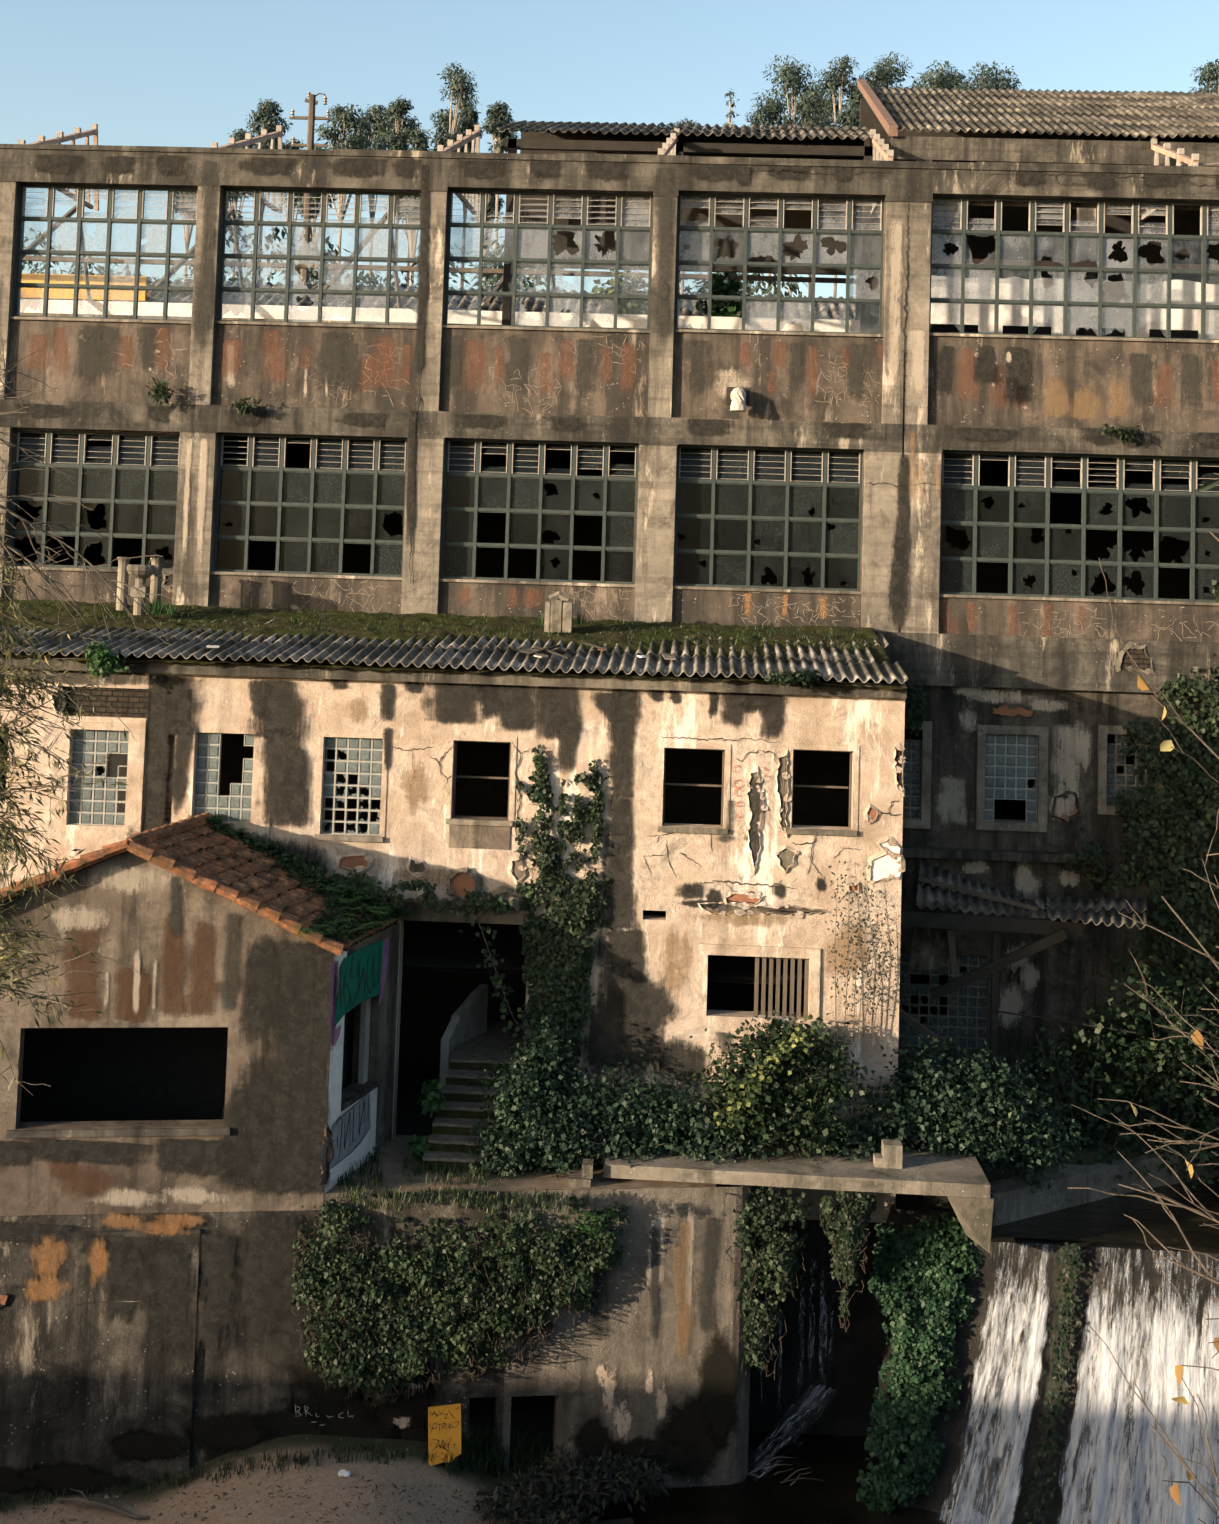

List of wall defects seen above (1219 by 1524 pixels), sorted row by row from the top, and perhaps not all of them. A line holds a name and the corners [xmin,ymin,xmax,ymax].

leakage [889,221,954,395]
leakage [19,669,199,837]
leakage [248,678,327,876]
leakage [329,679,730,1090]
flaking render [846,804,906,897]
flaking render [891,743,906,796]
flaking render [937,776,966,823]
flaking render [957,686,1091,825]
leakage [0,865,436,1496]
spalling [596,1364,633,1441]
leakage [569,1208,738,1480]
spalling [645,1368,669,1420]